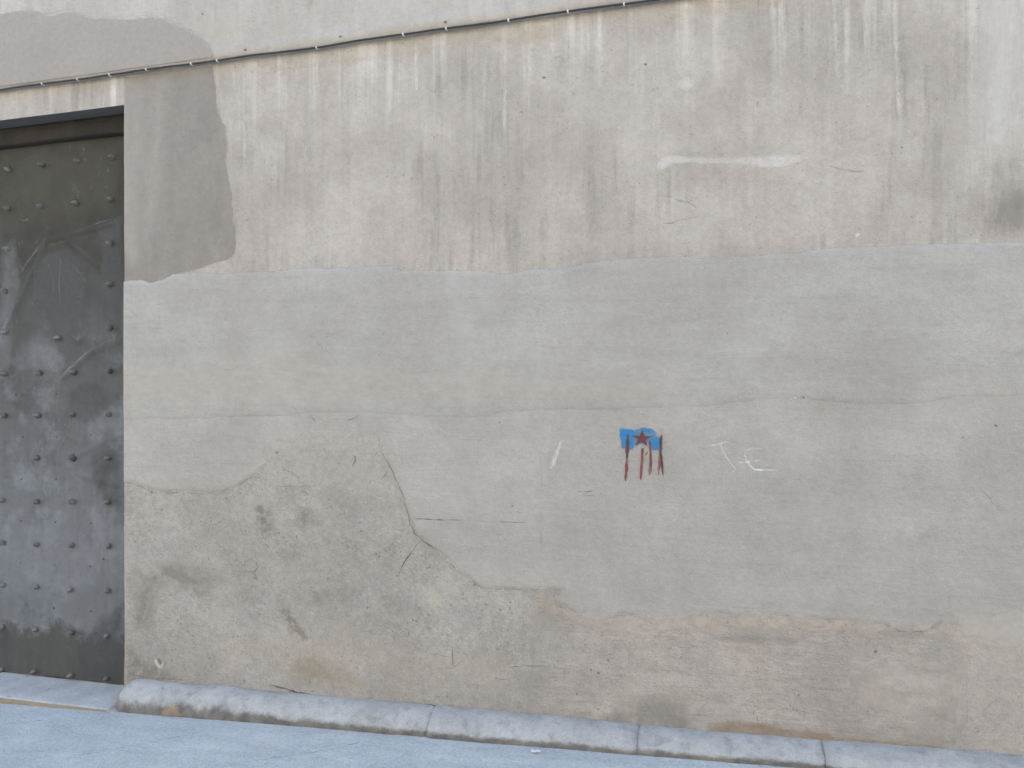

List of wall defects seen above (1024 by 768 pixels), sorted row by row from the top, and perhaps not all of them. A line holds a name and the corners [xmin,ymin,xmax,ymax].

crack [337,452,442,573]